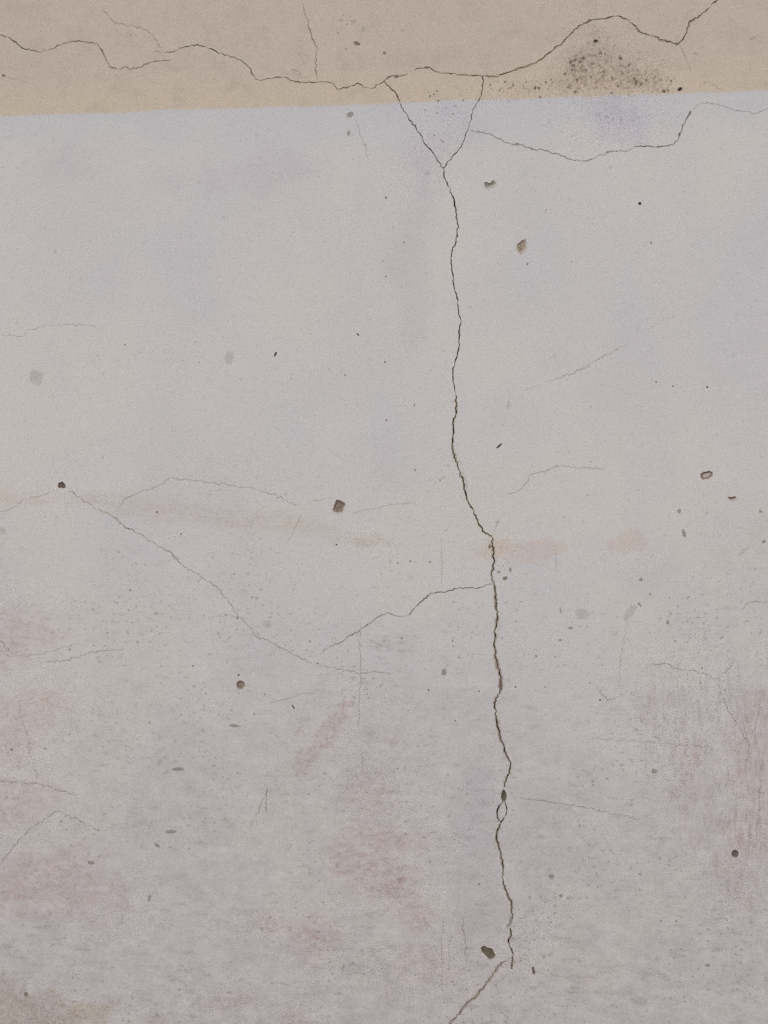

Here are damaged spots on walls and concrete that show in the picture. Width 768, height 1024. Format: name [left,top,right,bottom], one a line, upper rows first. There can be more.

crack [2,35,117,69]
crack [165,0,717,1024]